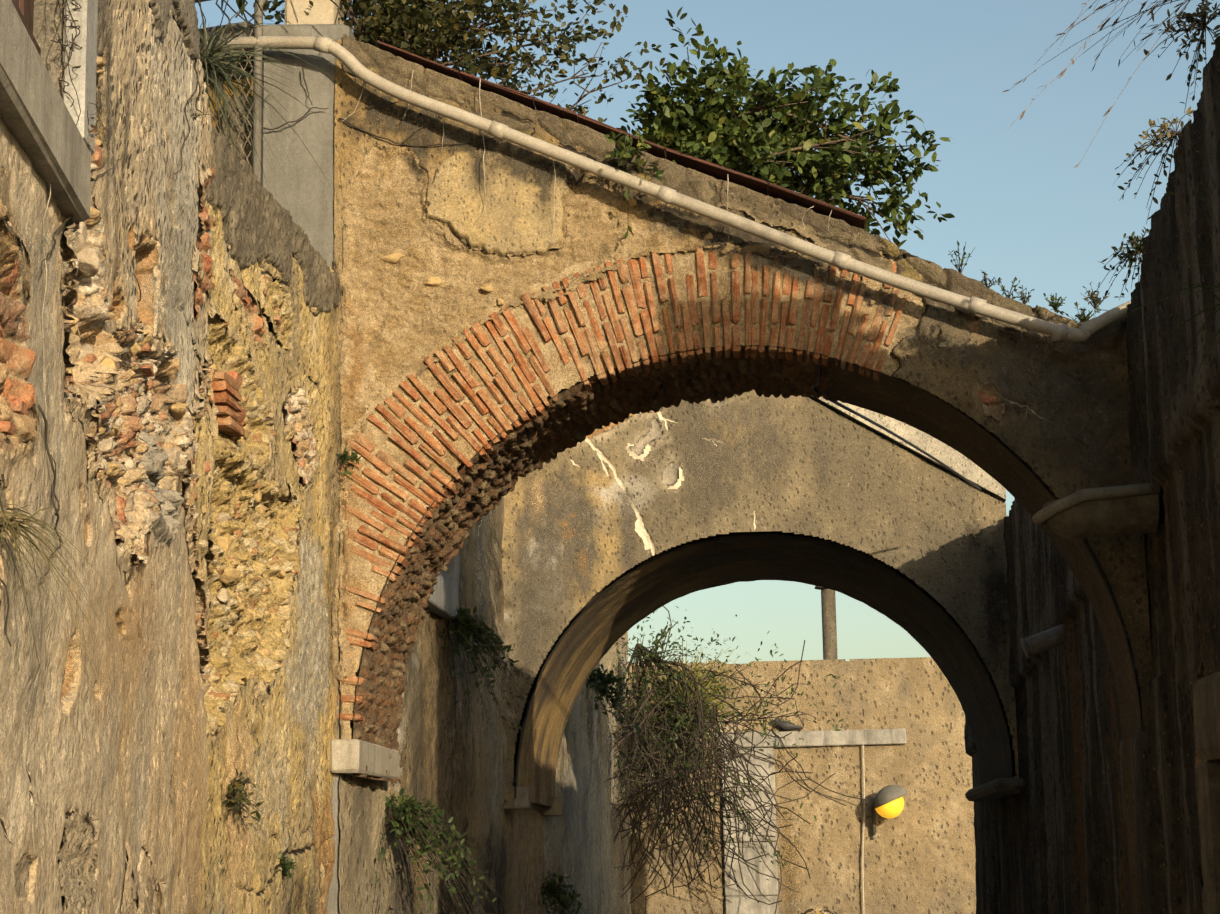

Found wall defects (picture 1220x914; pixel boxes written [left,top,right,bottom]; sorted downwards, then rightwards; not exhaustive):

spalling [87,56,111,180]
spalling [0,199,39,553]
spalling [60,117,829,751]
spalling [15,854,31,898]
spalling [58,807,99,914]
spalling [120,838,162,914]
crack [240,823,330,896]